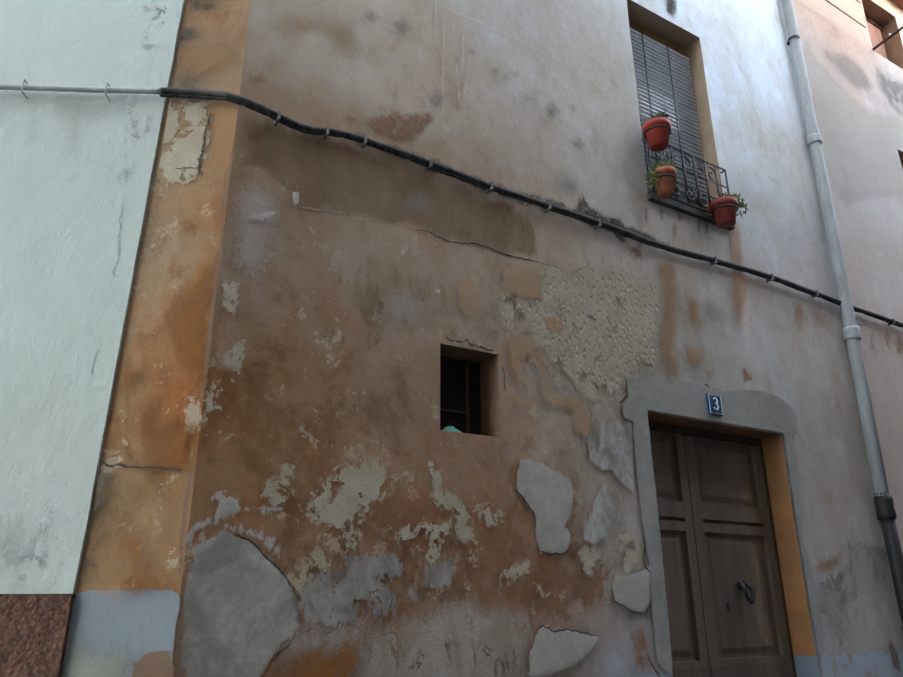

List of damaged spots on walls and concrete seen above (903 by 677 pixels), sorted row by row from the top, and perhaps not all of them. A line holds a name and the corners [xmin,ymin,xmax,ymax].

leakage [664,0,677,19]
leakage [824,49,903,117]
crack [176,114,211,176]
crack [112,202,123,277]
crack [407,227,590,272]
flaking render [490,252,672,576]
crack [101,461,185,471]
peeling [261,463,295,507]
peeling [287,455,507,628]
flaking render [491,559,565,604]